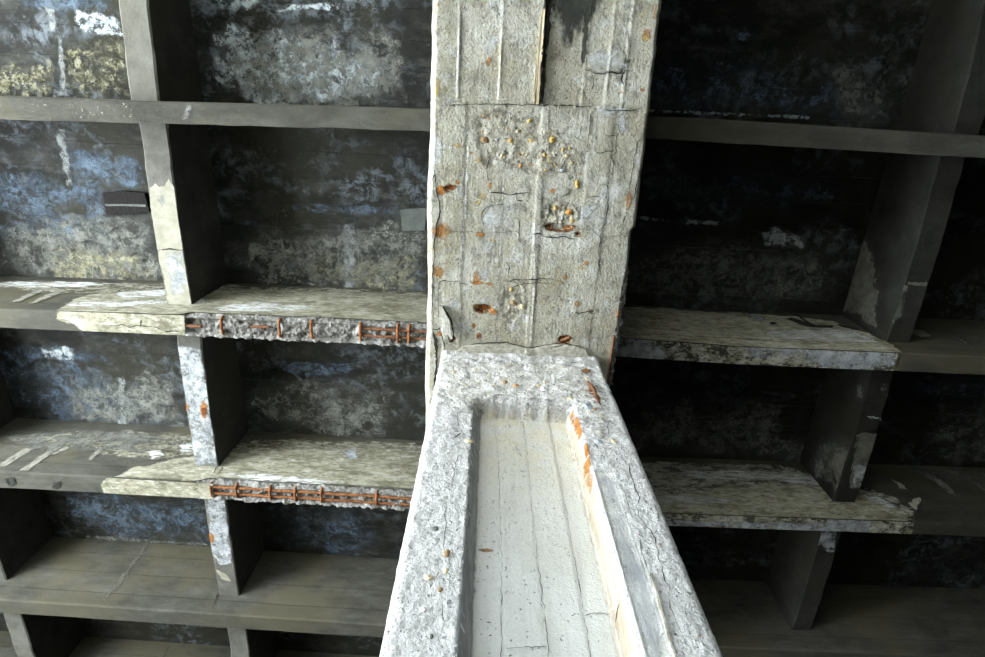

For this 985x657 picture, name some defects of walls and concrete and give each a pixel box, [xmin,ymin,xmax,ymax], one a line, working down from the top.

efflorescence [213,24,402,106]
damp [540,0,600,103]
rust [433,224,450,237]
rust [437,180,459,195]
crack [431,29,641,386]
spalling [546,224,576,232]
spalling [183,270,629,444]
rust [569,410,592,487]
spalling [197,478,414,511]